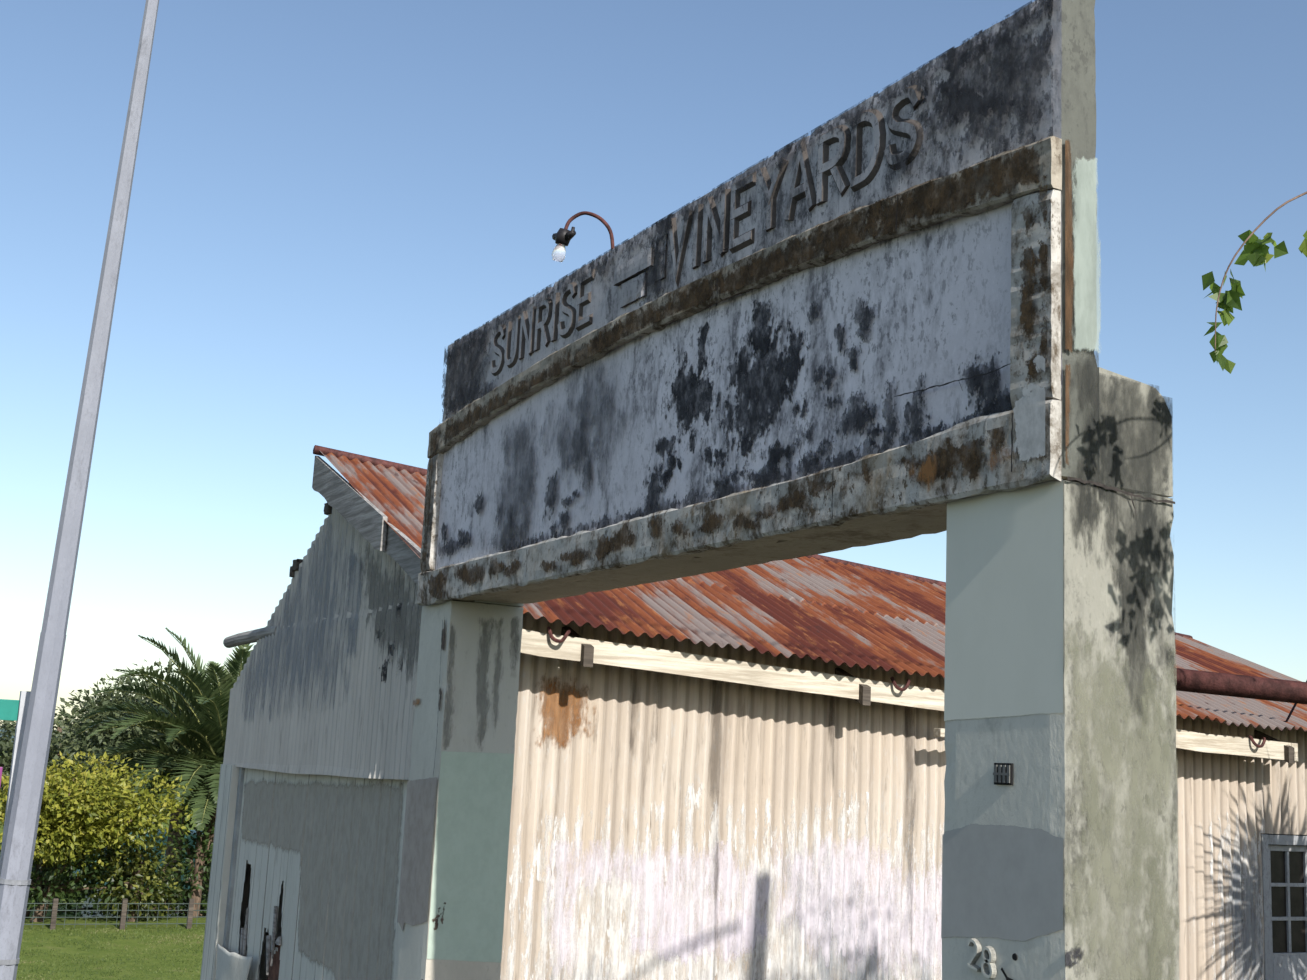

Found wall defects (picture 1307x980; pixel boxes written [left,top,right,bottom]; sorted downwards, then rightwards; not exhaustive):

leakage [245,524,431,713]
mould [438,351,625,556]
rust [540,676,596,748]
mould [639,297,942,517]
leakage [1069,354,1173,723]
mould [1066,944,1091,968]